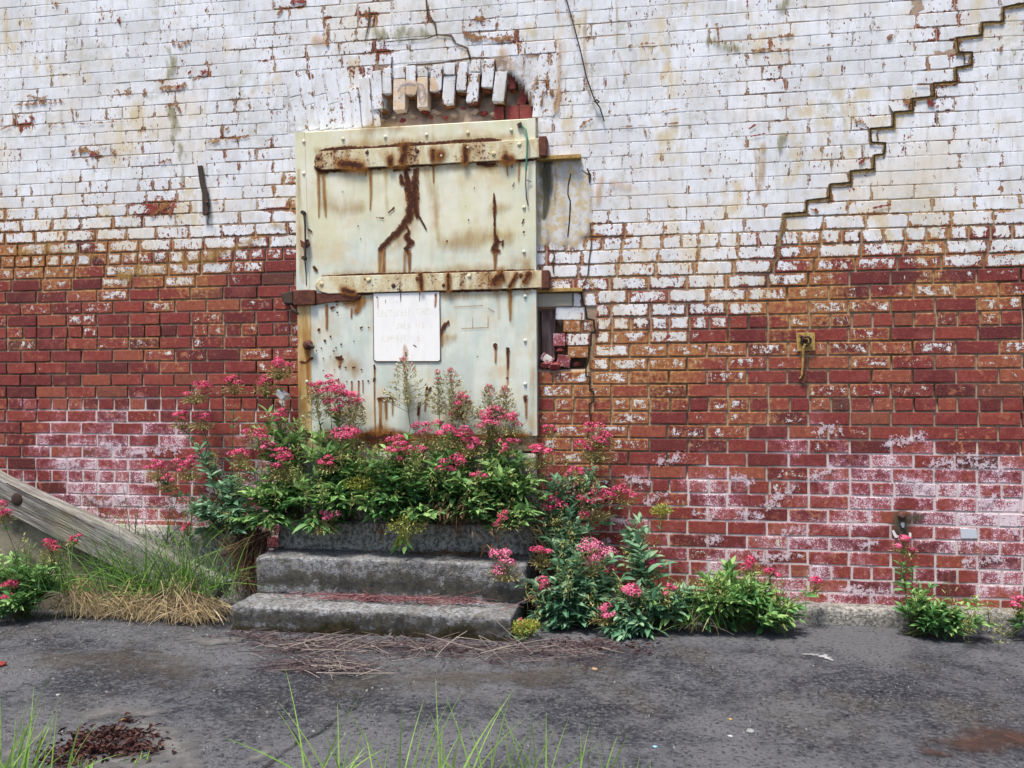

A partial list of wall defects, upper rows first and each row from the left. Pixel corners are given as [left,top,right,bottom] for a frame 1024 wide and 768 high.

crack [365,0,497,72]
crack [767,2,1024,272]
rust [299,138,539,446]
efflorescence [811,421,843,439]
efflorescence [880,430,928,451]
efflorescence [652,450,688,467]
efflorescence [899,452,1005,490]
efflorescence [622,473,669,506]
efflorescence [737,462,837,522]
efflorescence [752,549,795,567]
efflorescence [962,553,1005,569]
efflorescence [840,584,898,598]